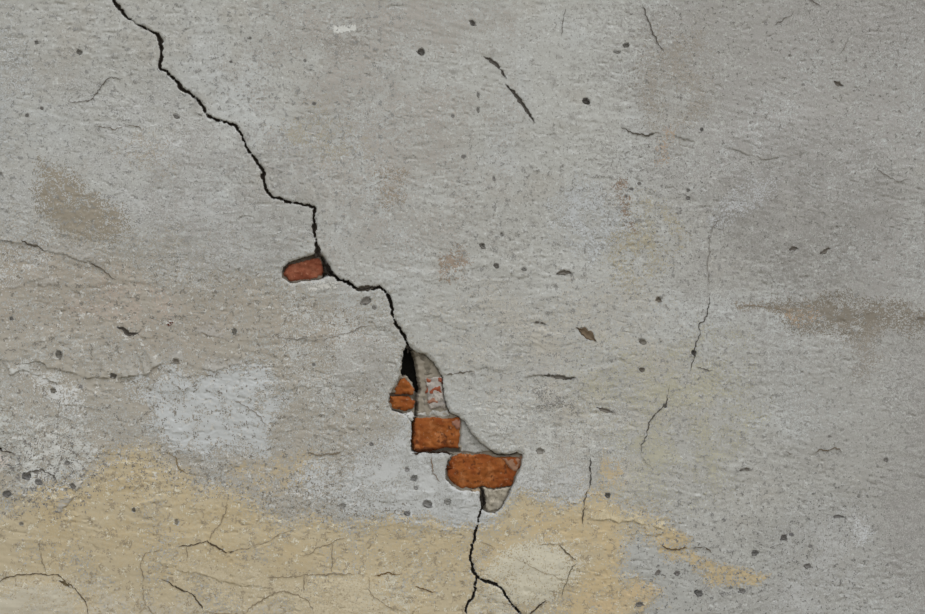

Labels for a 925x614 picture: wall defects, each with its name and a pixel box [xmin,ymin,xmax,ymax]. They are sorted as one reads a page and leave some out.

crack [112,0,413,353]
spalling [282,254,327,283]
crack [23,468,57,481]
crack [303,450,340,458]
crack [414,451,453,482]
spalling [388,345,522,513]
crack [0,542,88,613]
peeling [0,546,308,614]
crack [140,500,435,614]
crack [465,490,578,614]